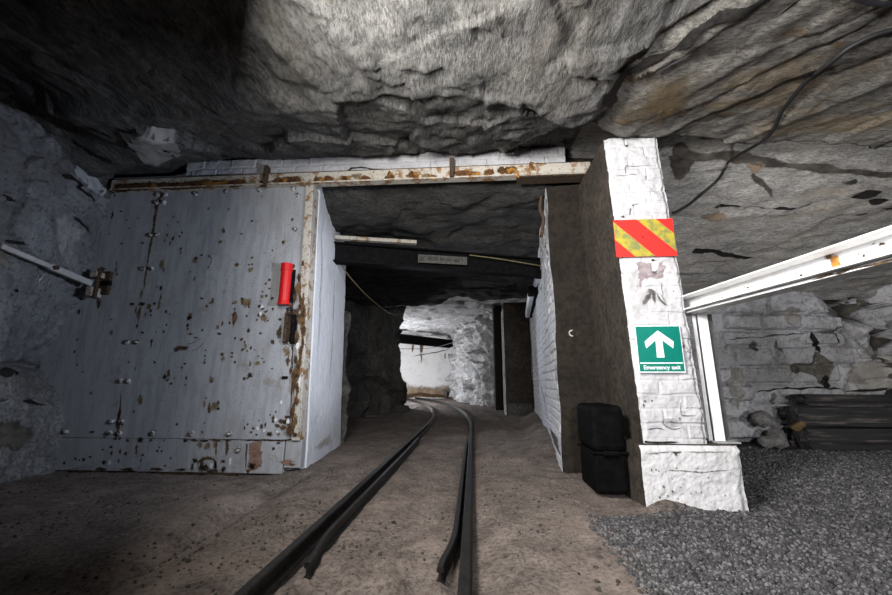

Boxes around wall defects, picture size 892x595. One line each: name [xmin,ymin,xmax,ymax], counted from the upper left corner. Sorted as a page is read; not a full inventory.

corrosion [406,171,437,181]
corrosion [454,162,534,178]
corrosion [814,254,892,280]
corrosion [63,278,296,476]